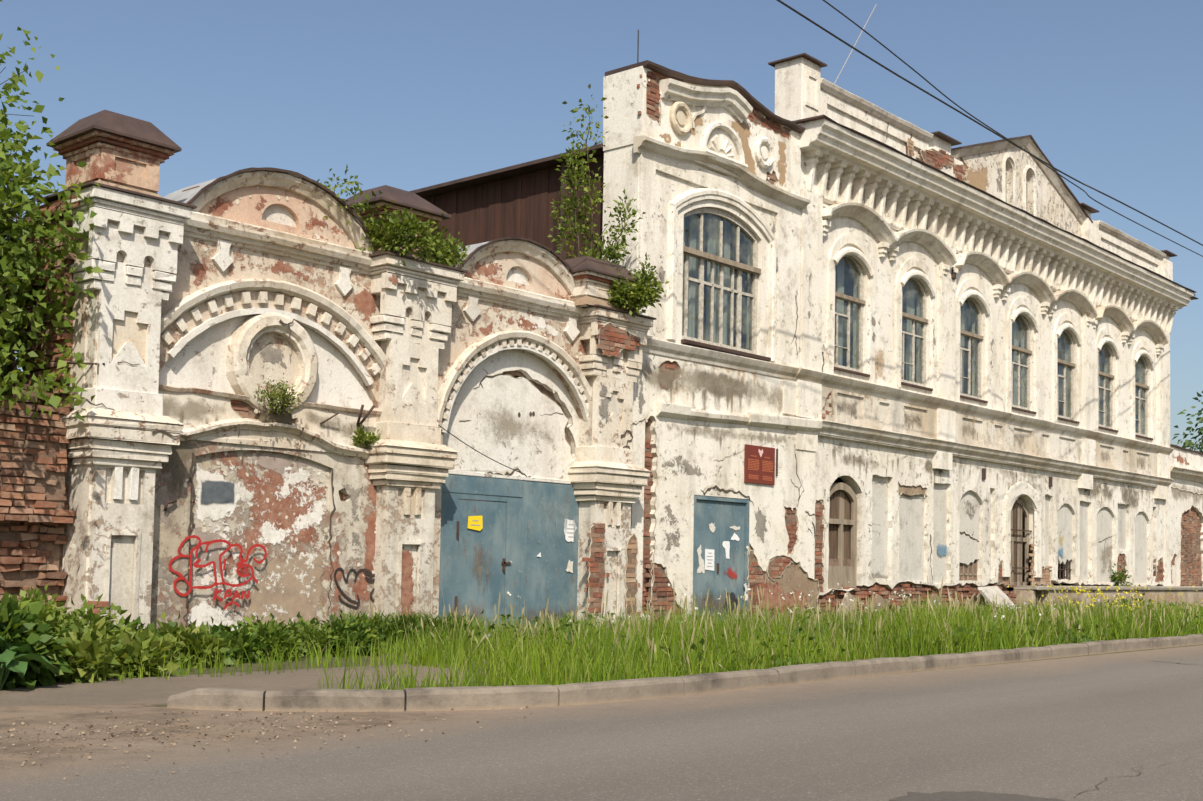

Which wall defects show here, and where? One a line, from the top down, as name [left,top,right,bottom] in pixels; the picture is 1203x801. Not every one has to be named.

spalling [637,70,707,148]
flaking render [732,107,792,187]
spalling [907,137,969,182]
flaking render [205,187,289,217]
flaking render [310,217,344,239]
crack [474,369,503,389]
spalling [575,321,649,359]
spalling [582,360,719,623]
flaking render [154,450,377,625]
spalling [744,499,1017,620]
spalling [1029,544,1052,586]
spalling [1153,505,1203,586]